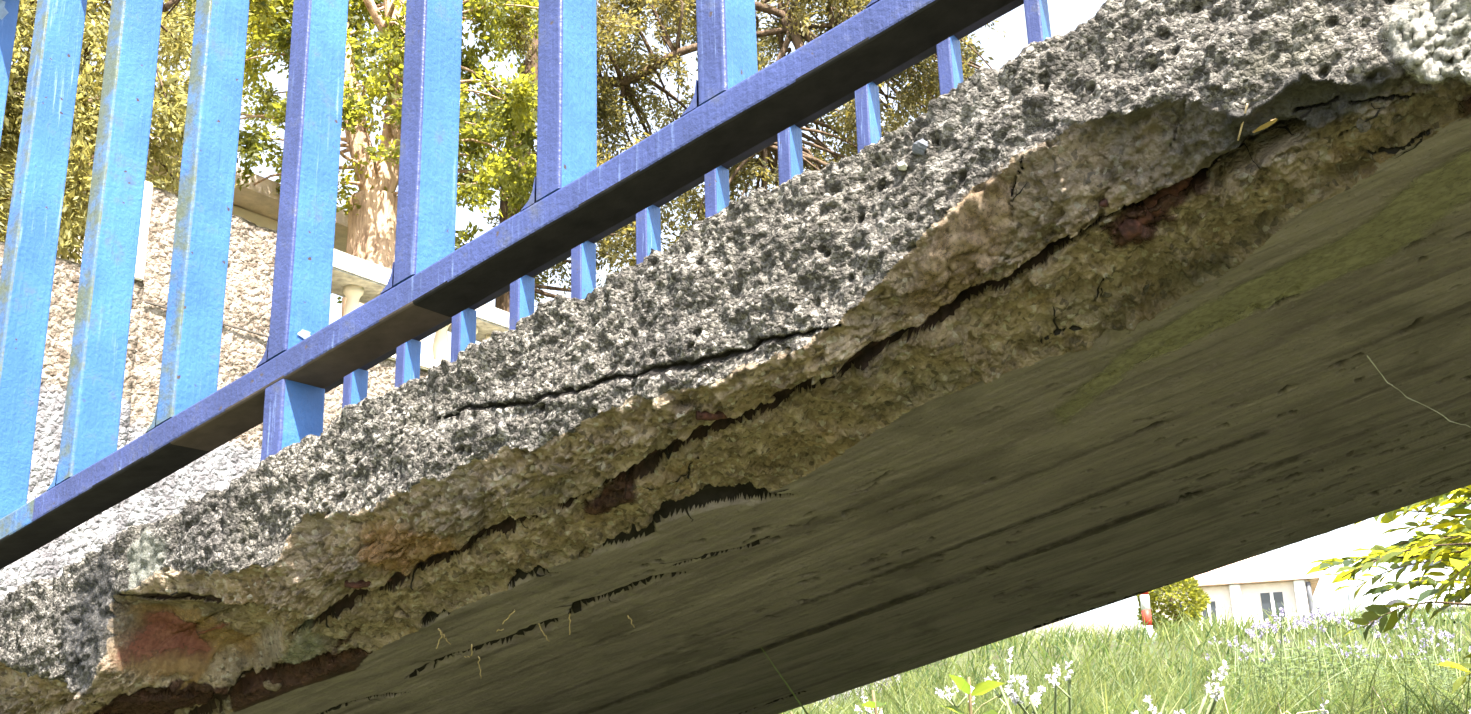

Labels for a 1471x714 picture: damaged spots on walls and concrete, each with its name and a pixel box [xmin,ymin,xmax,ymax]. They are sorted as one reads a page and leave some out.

spalling [759,64,1471,440]
crack [290,204,1125,714]
spalling [0,361,860,714]
rust [117,611,230,664]
crack [119,592,254,606]
crack [189,671,245,714]
rust [93,627,372,714]